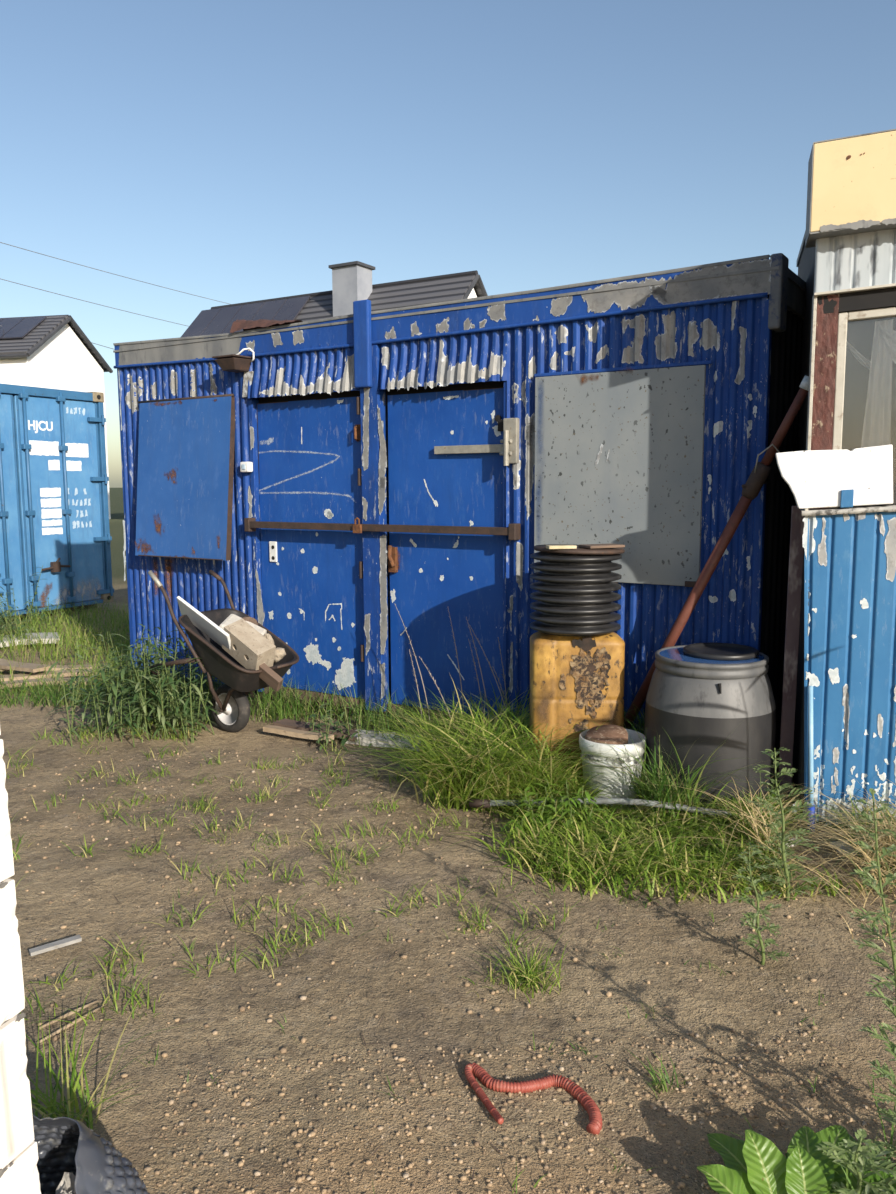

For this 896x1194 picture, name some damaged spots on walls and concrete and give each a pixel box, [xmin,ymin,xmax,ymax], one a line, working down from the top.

peeling [259,354,387,521]
peeling [381,317,536,520]
peeling [464,304,506,330]
peeling [533,259,772,439]
peeling [255,570,303,625]
peeling [304,535,396,700]
peeling [508,542,523,712]
peeling [802,516,827,567]
peeling [843,513,896,582]
peeling [793,654,896,828]